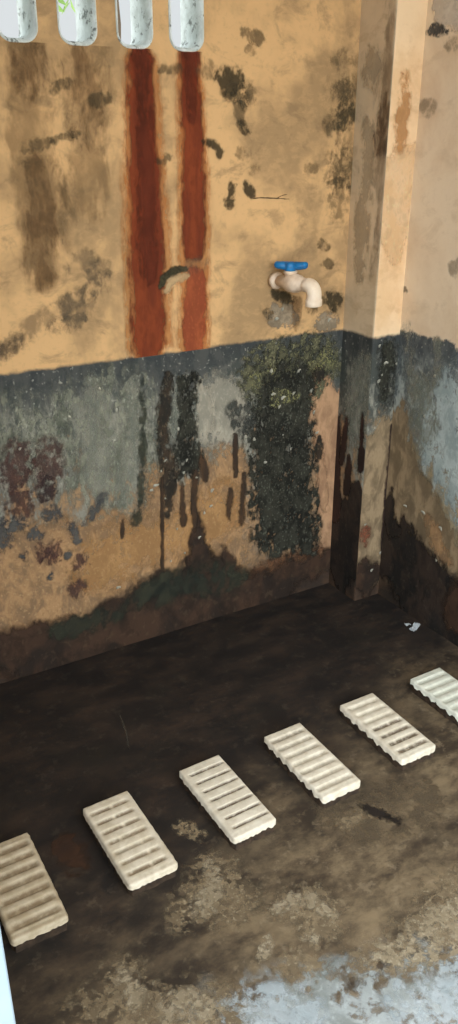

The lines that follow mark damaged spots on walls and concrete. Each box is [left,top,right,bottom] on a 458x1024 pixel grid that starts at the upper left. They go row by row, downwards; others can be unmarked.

damp [214,67,244,98]
damp [336,102,355,131]
damp [202,139,223,159]
corrosion [123,48,211,358]
damp [224,180,255,209]
damp [155,371,215,519]
damp [0,413,458,681]